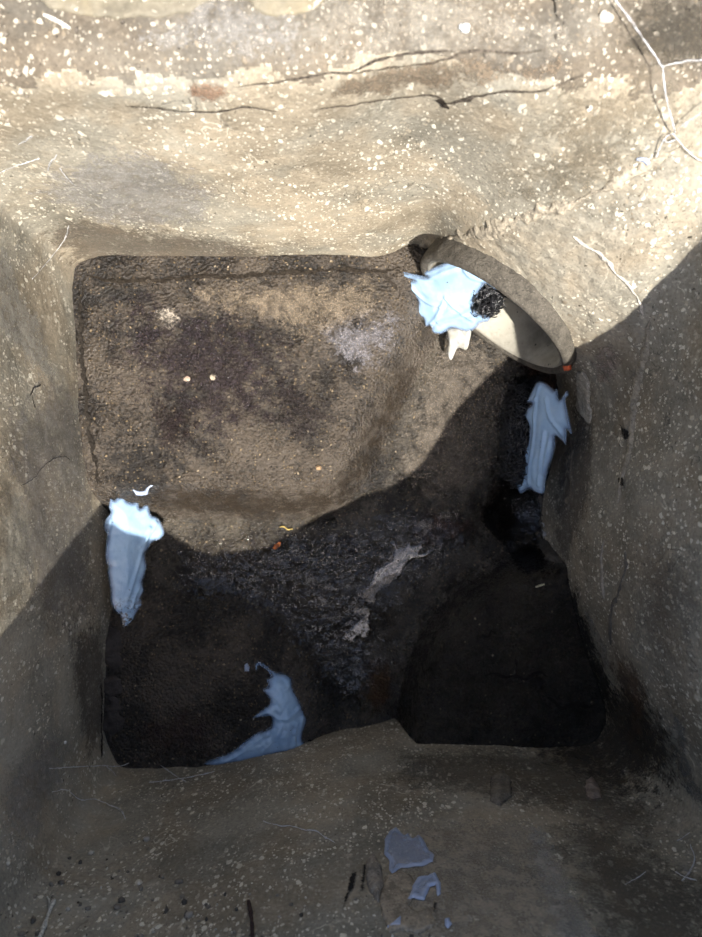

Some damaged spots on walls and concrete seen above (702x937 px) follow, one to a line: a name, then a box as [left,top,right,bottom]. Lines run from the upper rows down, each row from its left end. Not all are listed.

crack [126,47,583,113]
water stain [116,294,337,448]
water stain [144,339,547,521]